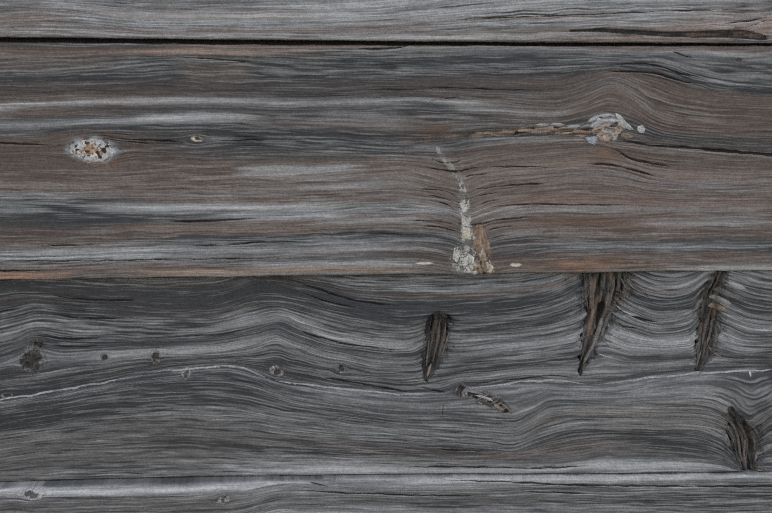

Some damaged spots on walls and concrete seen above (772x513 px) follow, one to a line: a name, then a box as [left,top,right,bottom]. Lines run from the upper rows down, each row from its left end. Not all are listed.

crack [445,9,766,33]
crack [414,157,630,238]
crack [468,271,653,388]
crack [692,271,746,373]
crack [310,406,772,497]